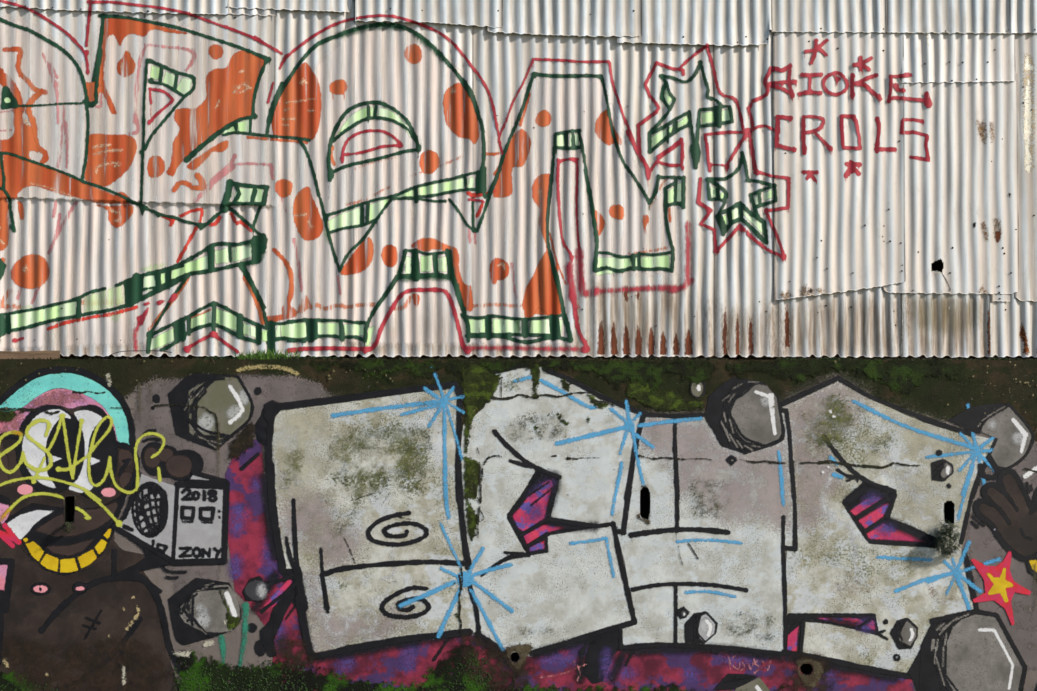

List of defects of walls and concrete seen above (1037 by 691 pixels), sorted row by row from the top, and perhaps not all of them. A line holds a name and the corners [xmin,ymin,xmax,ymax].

corrosion [981,219,1001,243]
corrosion [597,323,693,355]
corrosion [723,309,754,355]
corrosion [1019,326,1030,355]